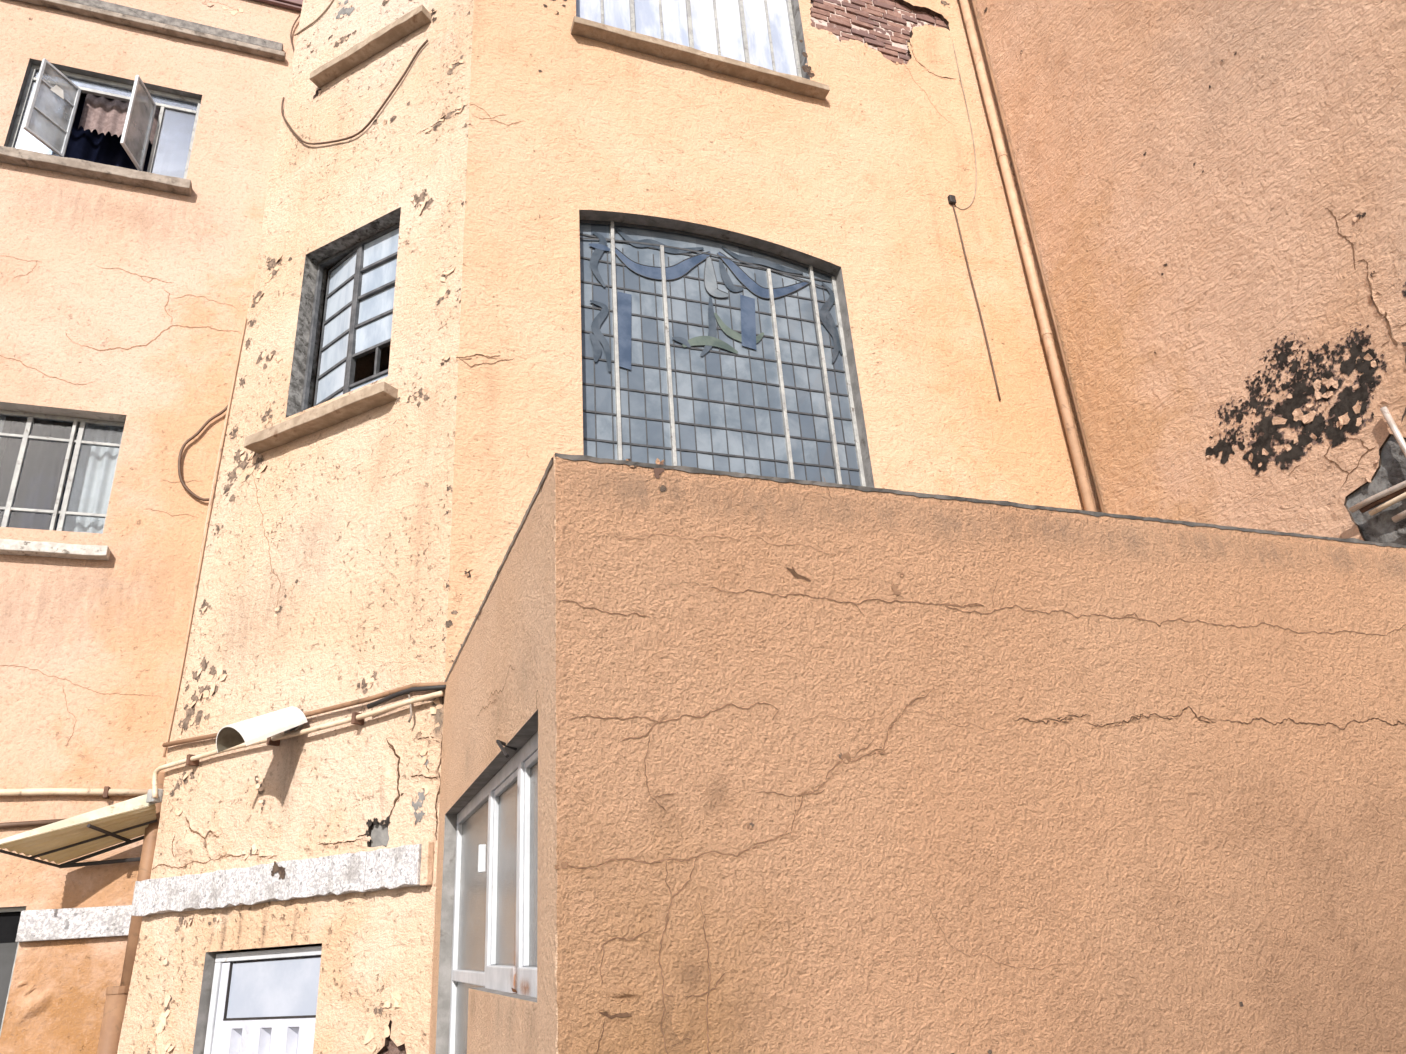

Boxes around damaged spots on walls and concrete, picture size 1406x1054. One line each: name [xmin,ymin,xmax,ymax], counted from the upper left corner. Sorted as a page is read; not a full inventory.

flaking render [800,0,950,78]
crack [66,268,239,351]
crack [1325,208,1406,348]
peeling [1205,322,1406,545]
crack [1288,438,1375,485]
crack [668,580,1404,636]
peeling [177,657,227,735]
crack [153,815,278,869]
flaking render [365,816,390,847]
peeling [412,784,430,827]
crack [477,666,1406,1054]
flaking render [344,990,411,1054]